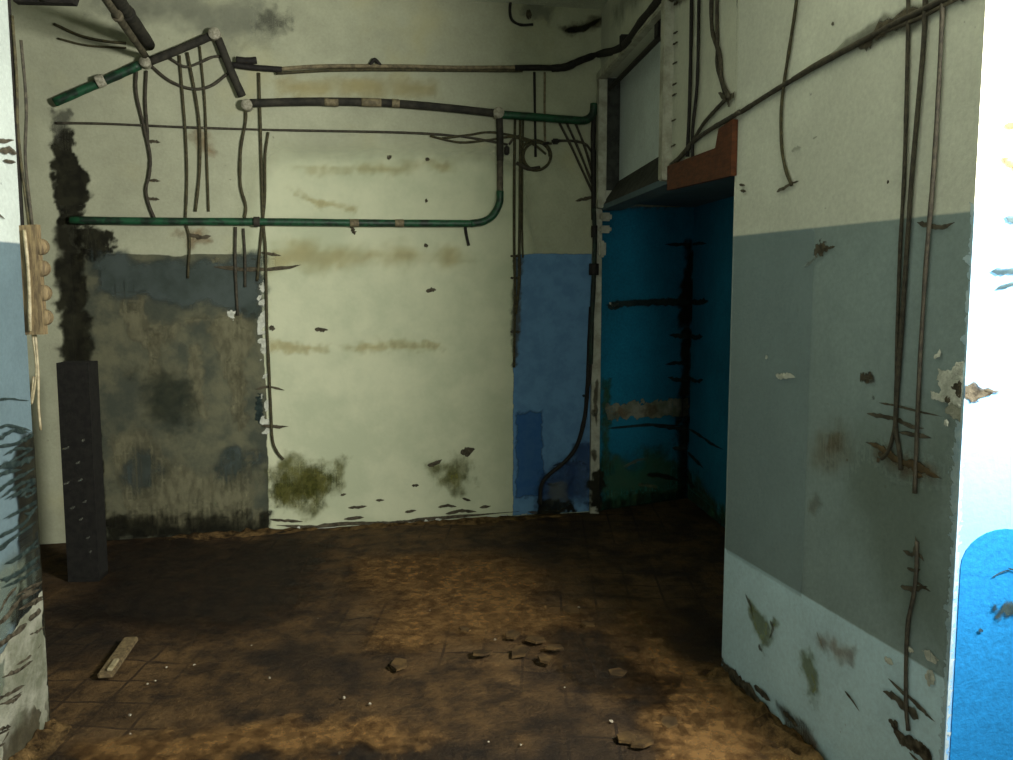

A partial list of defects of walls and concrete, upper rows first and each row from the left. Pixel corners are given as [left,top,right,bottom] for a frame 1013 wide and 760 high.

spalling [605,398,689,429]
damp [216,446,344,516]
damp [431,462,467,494]
spalling [888,202,1000,760]
damp [0,562,33,638]
spalling [0,424,50,760]